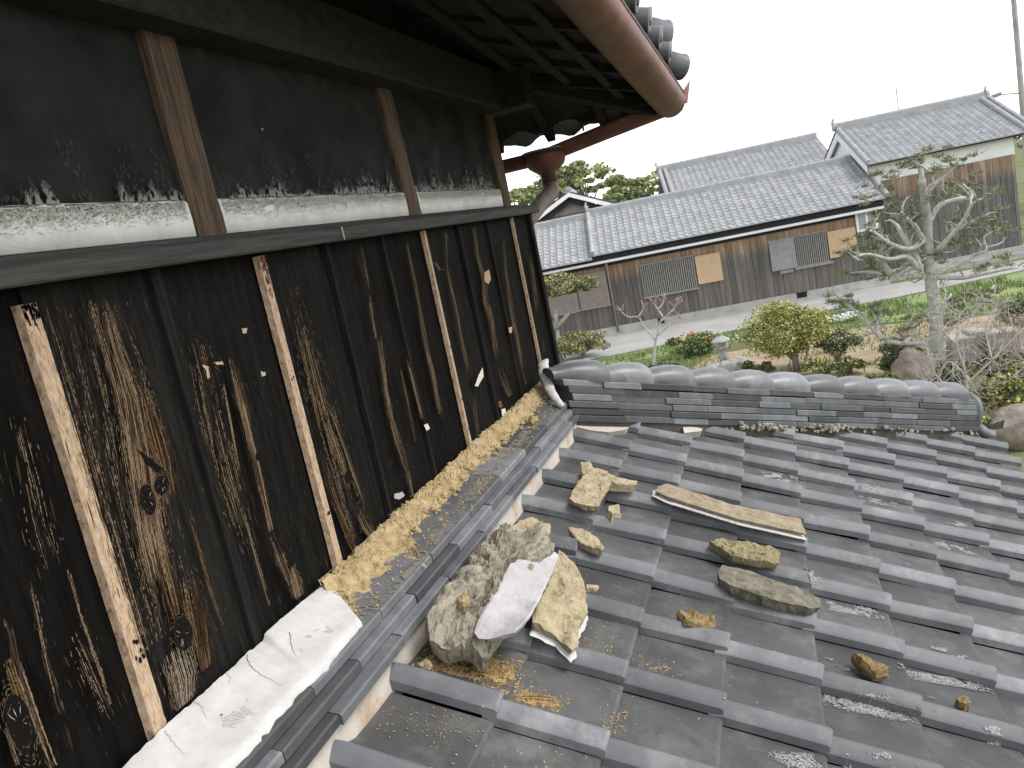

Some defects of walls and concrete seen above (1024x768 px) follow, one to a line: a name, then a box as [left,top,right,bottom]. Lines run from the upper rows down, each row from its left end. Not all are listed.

leakage [0,140,189,238]
leakage [214,155,407,220]
leakage [416,160,501,206]